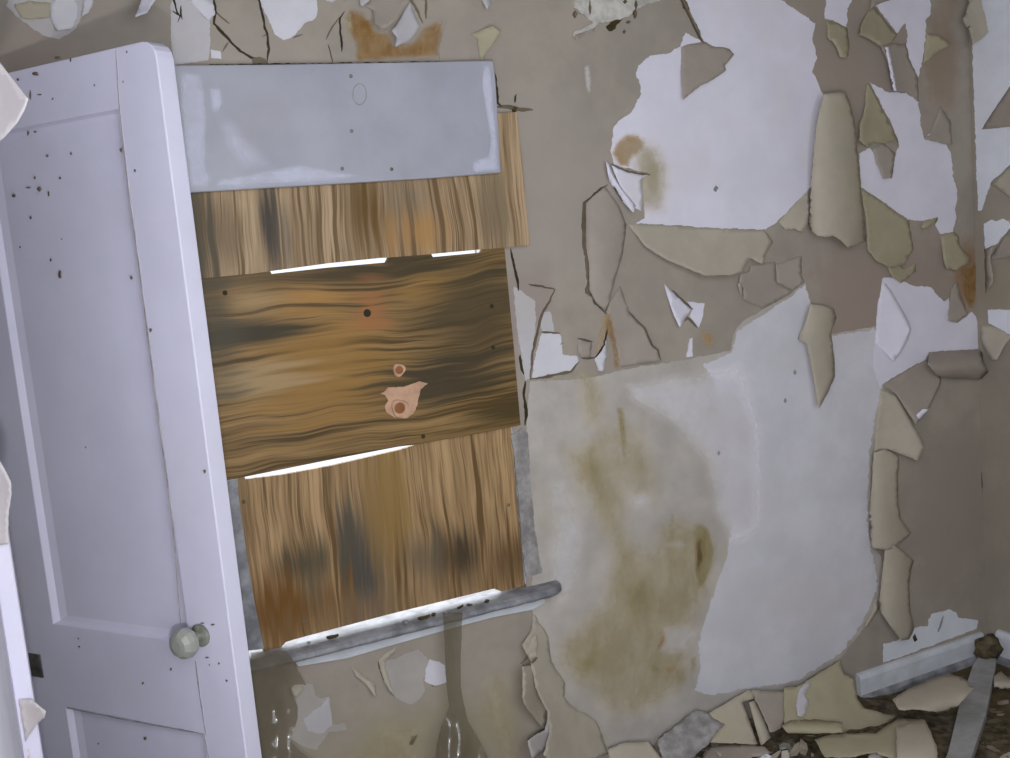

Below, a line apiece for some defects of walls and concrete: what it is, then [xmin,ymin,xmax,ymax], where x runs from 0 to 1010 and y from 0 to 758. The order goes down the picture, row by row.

peeling [135,0,155,17]
crack [173,0,183,21]
flaking render [170,0,222,65]
flaking render [260,0,335,40]
crack [209,0,438,65]
hole [606,0,638,34]
water stain [633,371,758,538]
water stain [552,488,580,590]
water stain [565,408,713,710]
flaking render [883,609,978,663]
flaking render [378,647,446,704]